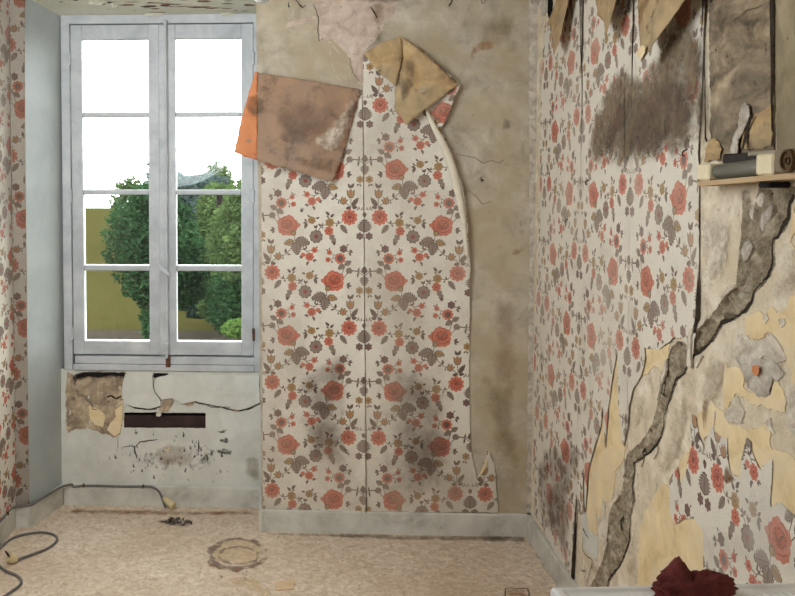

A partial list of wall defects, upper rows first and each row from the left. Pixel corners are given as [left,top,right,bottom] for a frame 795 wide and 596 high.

flaking render [285,0,398,86]
damp [590,23,703,161]
flaking render [708,0,775,161]
crack [121,375,161,410]
flaking render [65,371,260,437]
crack [195,401,260,411]
crack [571,185,795,587]
flaking render [582,498,609,559]